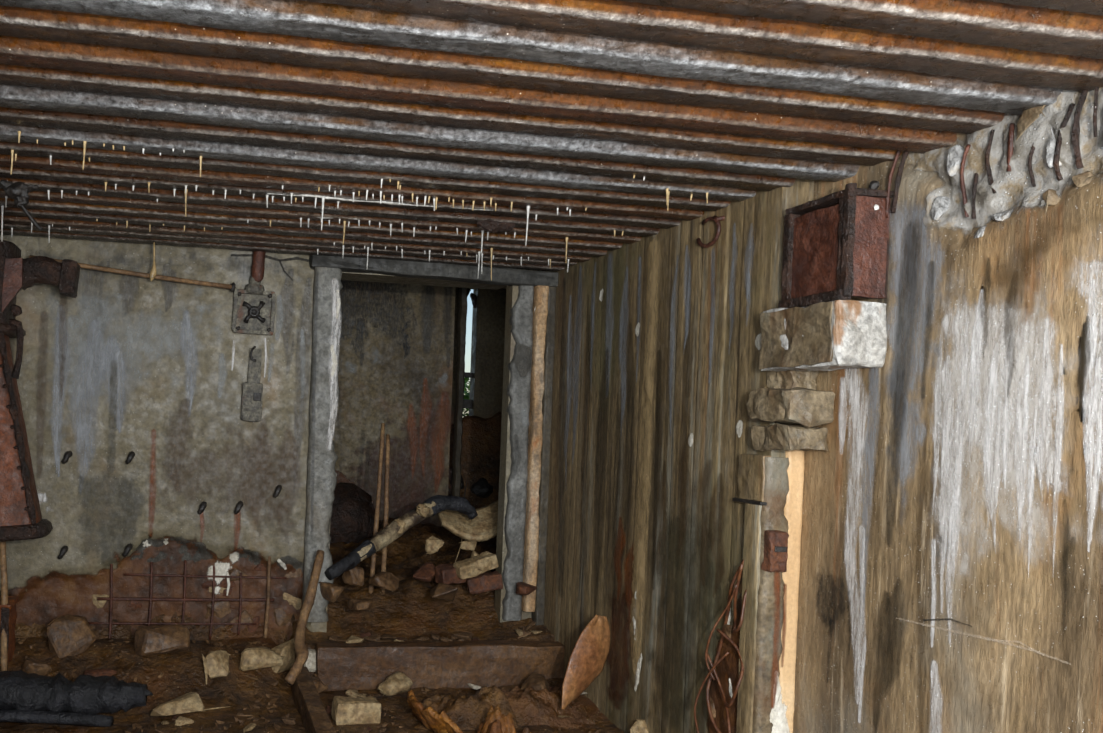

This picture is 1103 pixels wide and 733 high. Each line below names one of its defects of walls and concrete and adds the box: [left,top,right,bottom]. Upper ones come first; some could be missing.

spalling [885,87,1103,238]
leakage [53,262,310,563]
leakage [817,207,1074,733]
leakage [1078,262,1103,552]